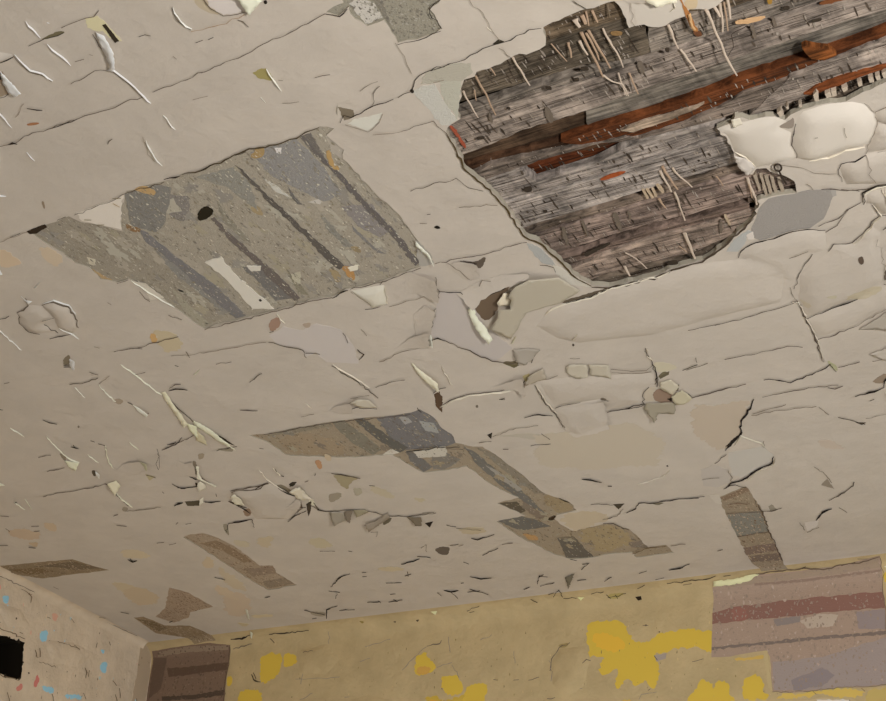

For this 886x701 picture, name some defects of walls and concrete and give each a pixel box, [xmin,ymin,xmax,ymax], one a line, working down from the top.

crack [0,9,347,147]
crack [171,0,248,43]
peeling [631,0,696,31]
crack [58,127,319,220]
peeling [734,152,756,176]
crack [3,302,79,339]
crack [96,315,422,450]
spalling [99,126,434,388]
peeling [397,242,678,413]
crack [205,0,886,629]
spalling [252,399,672,559]
spalling [586,556,886,701]